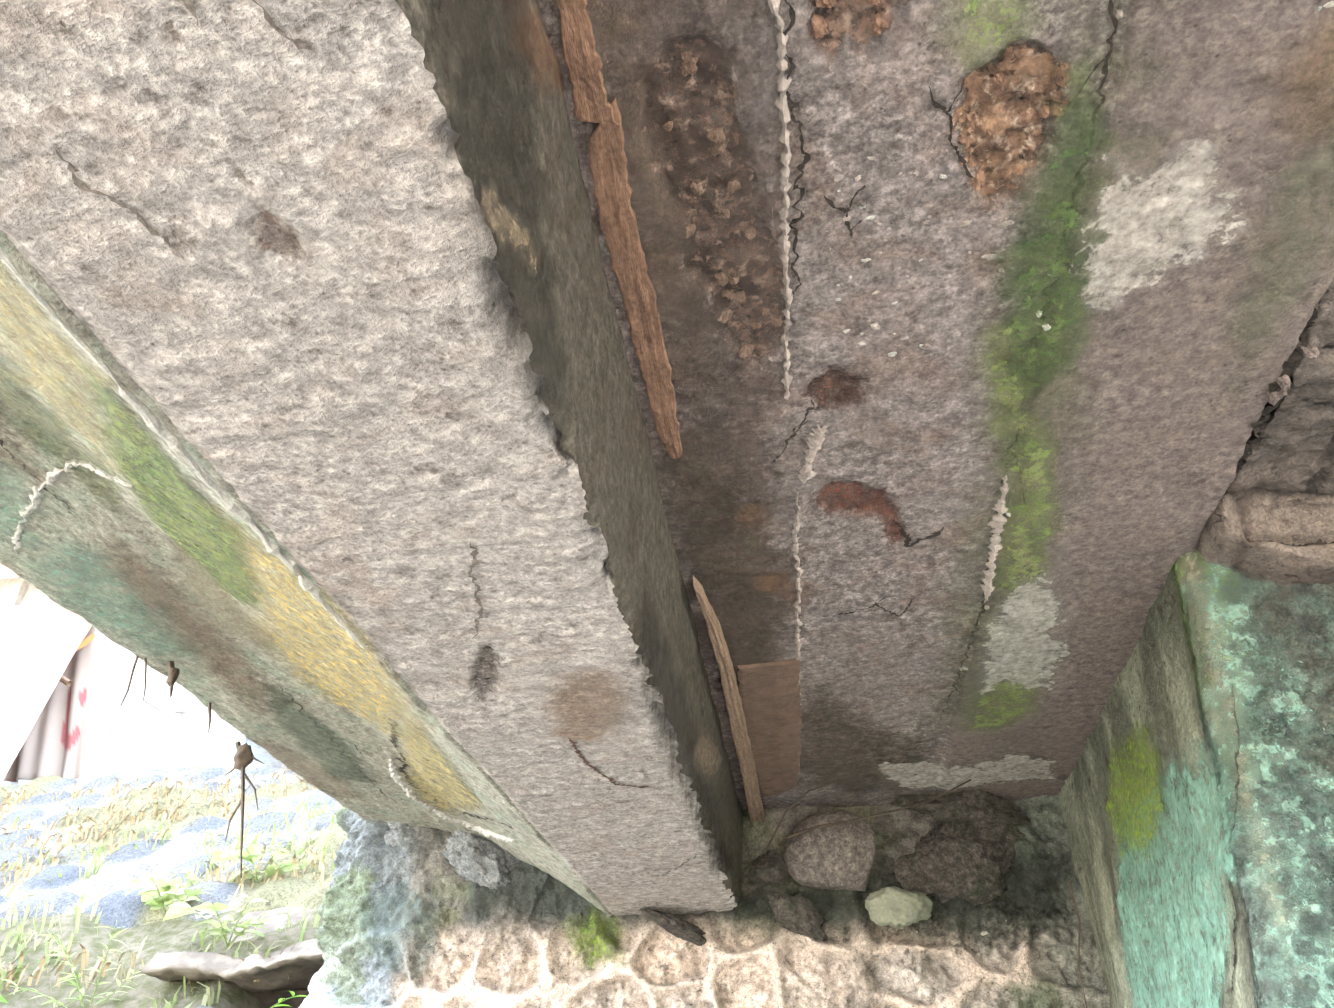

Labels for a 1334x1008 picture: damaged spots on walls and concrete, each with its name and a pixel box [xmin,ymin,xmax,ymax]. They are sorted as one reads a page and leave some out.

crack [183,0,198,25]
crack [252,0,317,55]
spalling [807,0,907,65]
spalling [949,44,1071,209]
crack [1071,0,1124,207]
spalling [630,30,790,363]
leakage [1069,140,1248,310]
spalling [801,366,869,410]
peeling [840,321,930,357]
corrosion [814,481,944,547]
crack [939,280,1057,723]
leakage [977,573,1071,695]